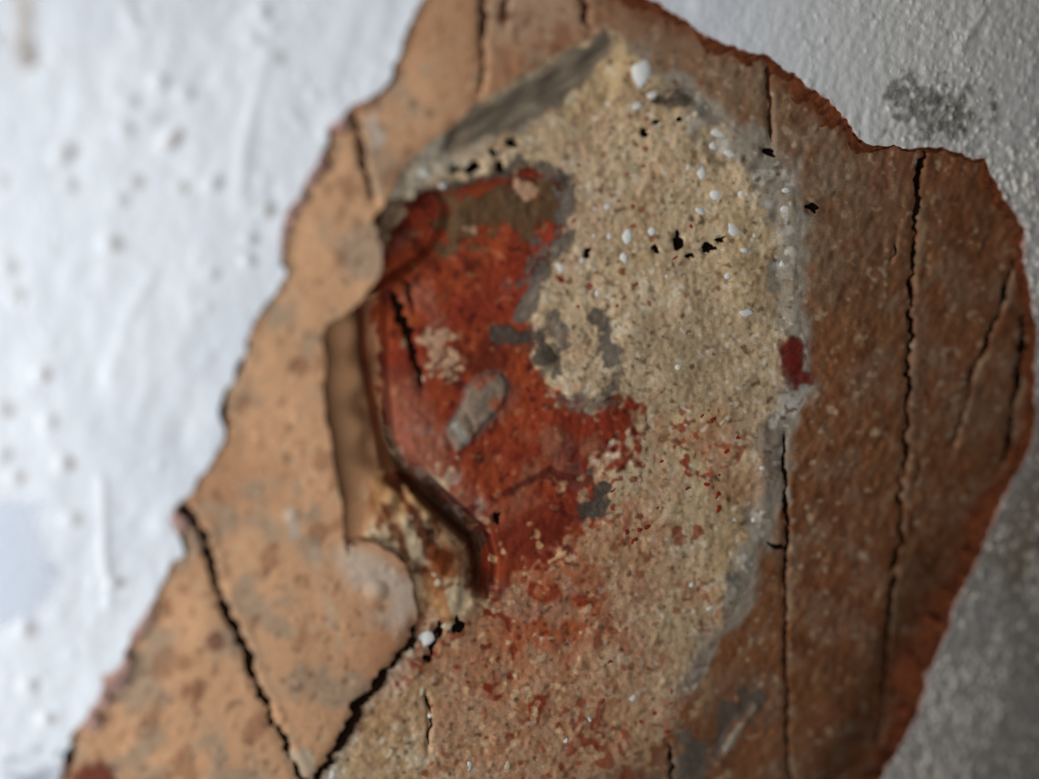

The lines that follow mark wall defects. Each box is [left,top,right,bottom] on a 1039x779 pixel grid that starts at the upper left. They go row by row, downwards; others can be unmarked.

spalling [68,588,160,749]
spalling [320,30,811,779]
crack [766,431,792,779]
crack [876,149,926,741]
crack [954,258,1027,466]
spalling [1011,366,1027,444]